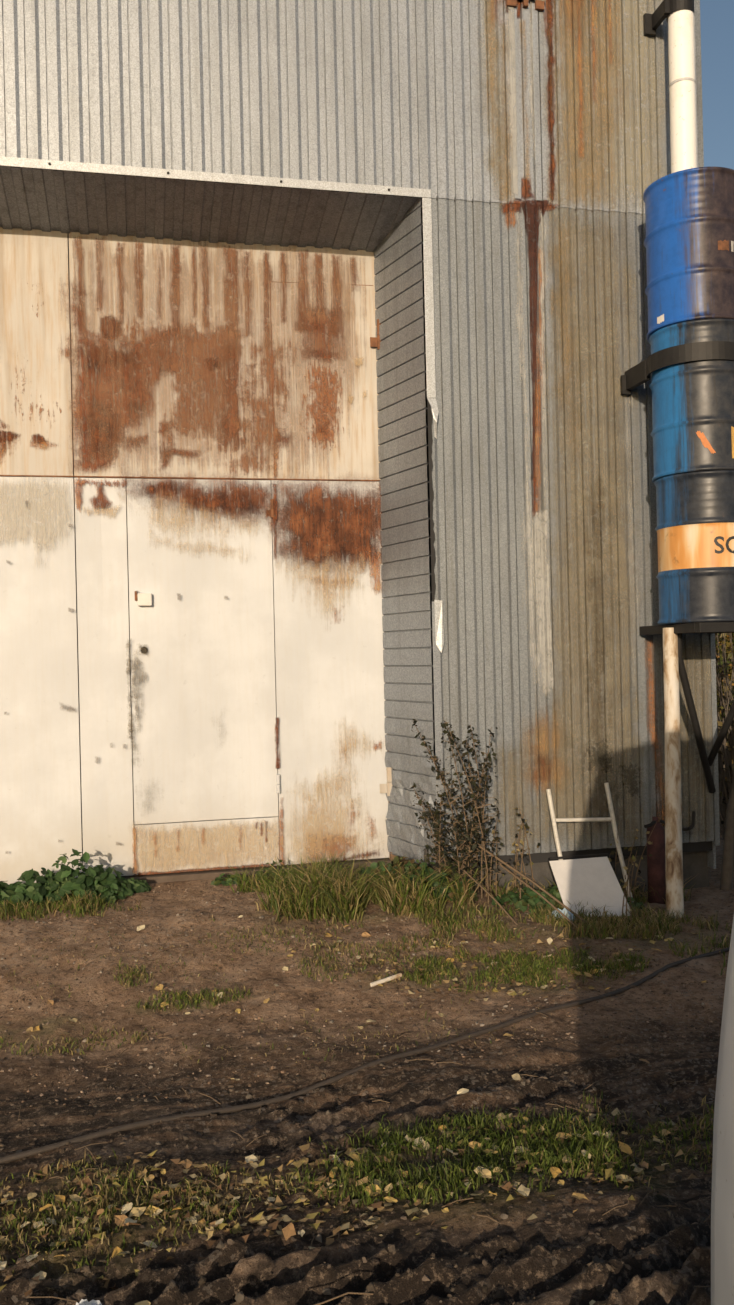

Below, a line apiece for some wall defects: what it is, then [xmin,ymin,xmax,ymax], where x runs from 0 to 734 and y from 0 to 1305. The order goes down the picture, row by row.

corrosion [0,238,382,608]
corrosion [491,0,612,516]